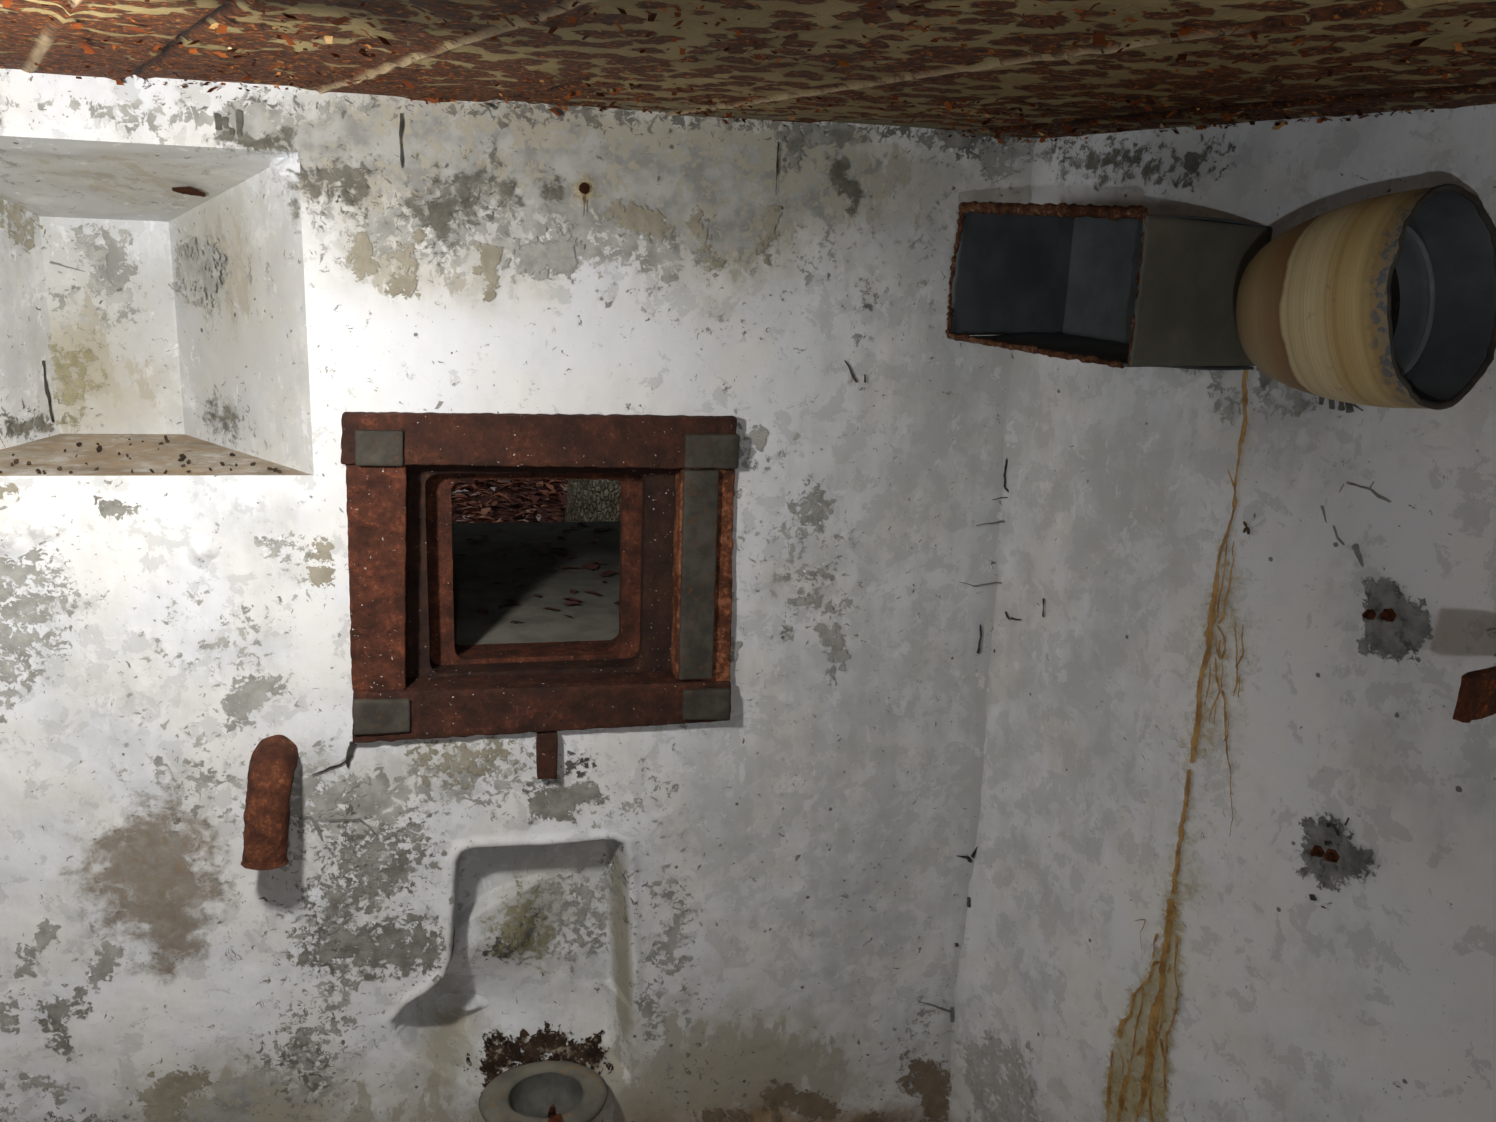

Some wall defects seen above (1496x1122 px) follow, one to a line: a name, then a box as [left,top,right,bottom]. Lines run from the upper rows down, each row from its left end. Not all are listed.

rust [41,0,1496,143]
rust [945,201,1148,369]
peeling [0,540,94,733]
peeling [220,673,286,734]
peeling [254,530,336,588]
rust [1103,370,1248,1122]
spalling [1356,577,1434,665]
leakage [82,801,223,975]
spalling [1293,813,1381,909]
peeling [0,918,213,1122]
leakage [686,1079,885,1122]
leakage [895,1049,954,1122]